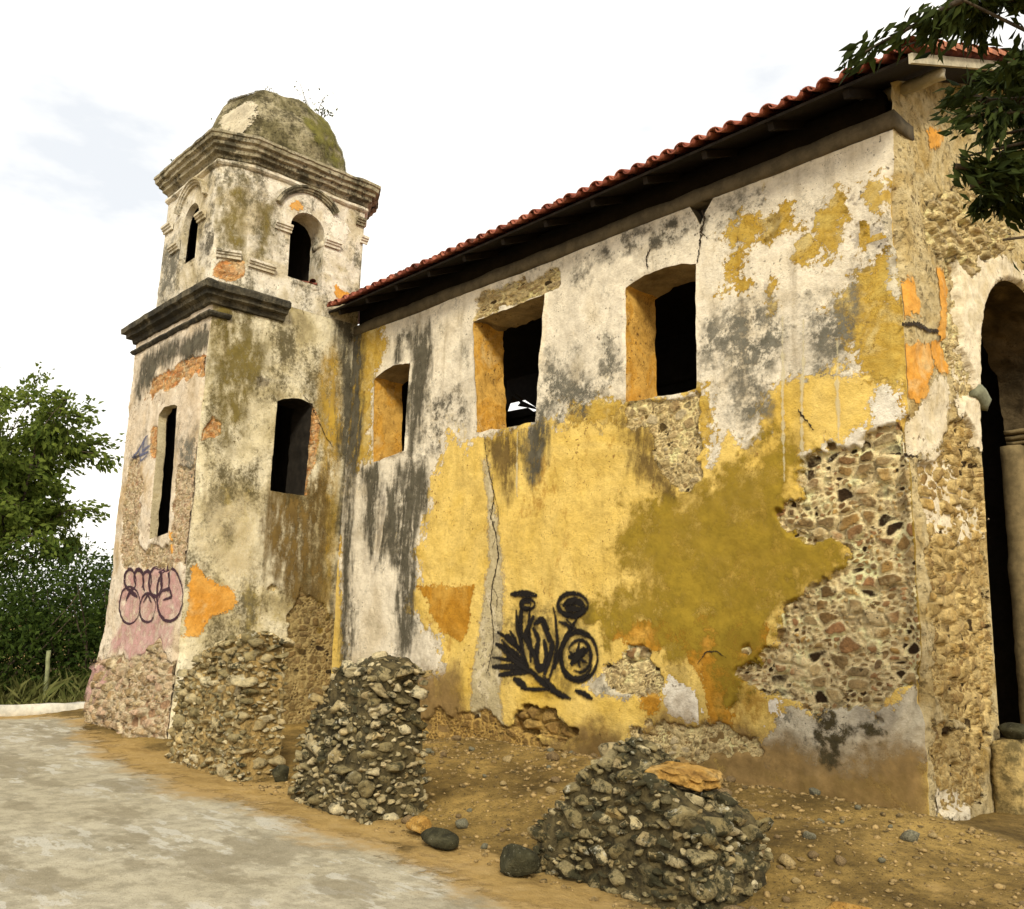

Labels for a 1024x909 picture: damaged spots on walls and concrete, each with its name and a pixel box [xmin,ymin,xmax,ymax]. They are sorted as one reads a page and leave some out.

flaking render [119,416,239,638]
water stain [180,437,197,485]
water stain [136,319,266,444]
water stain [261,319,467,660]
crack [483,434,499,671]
peeling [280,130,1016,821]
crack [697,210,708,262]
water stain [580,298,852,707]
mould [807,282,860,370]
water stain [644,711,929,815]